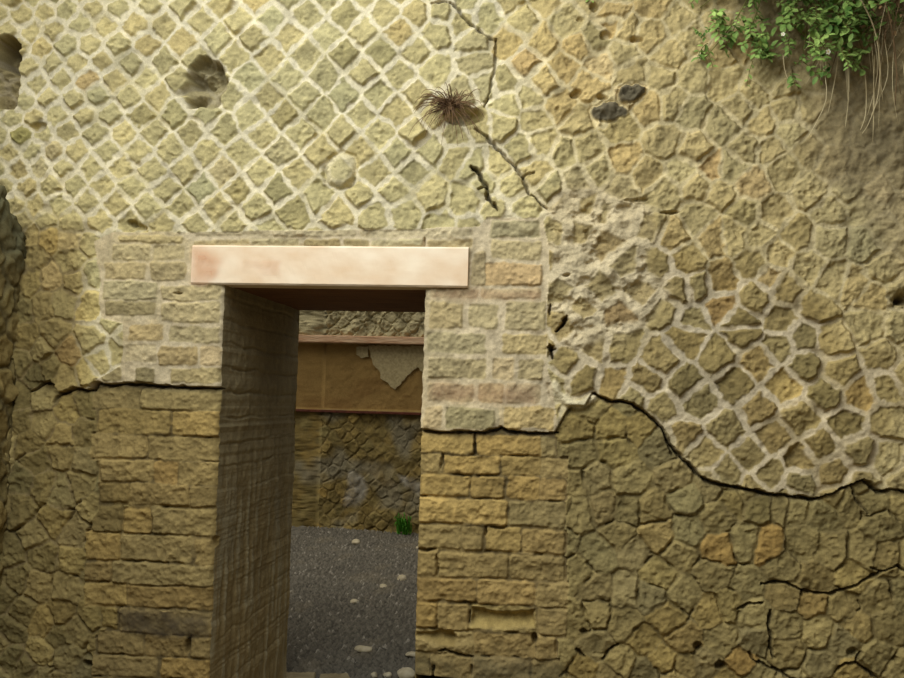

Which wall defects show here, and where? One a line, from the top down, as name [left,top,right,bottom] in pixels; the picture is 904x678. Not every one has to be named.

crack [430,0,549,212]
spalling [886,286,904,311]
peeling [356,345,424,390]
crack [6,358,226,495]
crack [421,425,559,455]
crack [592,391,904,515]
crack [575,643,620,661]
crack [736,563,904,678]